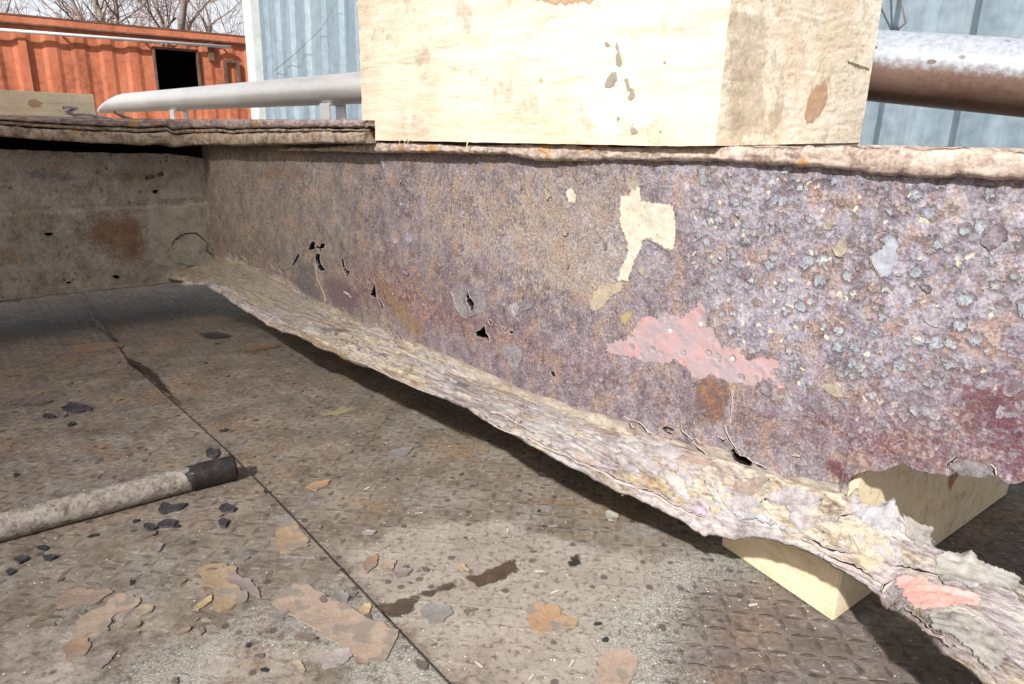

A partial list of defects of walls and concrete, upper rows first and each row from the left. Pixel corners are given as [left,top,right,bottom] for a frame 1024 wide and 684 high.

crack [165,232,326,302]
peeling [589,172,676,311]
peeling [606,300,785,396]
crack [477,408,704,521]
corrosion [695,375,732,425]
crack [679,381,767,470]
peeling [616,427,841,544]
corrosion [827,460,848,482]
corrosion [949,459,994,478]
corrosion [950,373,1024,460]
peeling [996,377,1024,418]
peeling [842,495,1022,670]